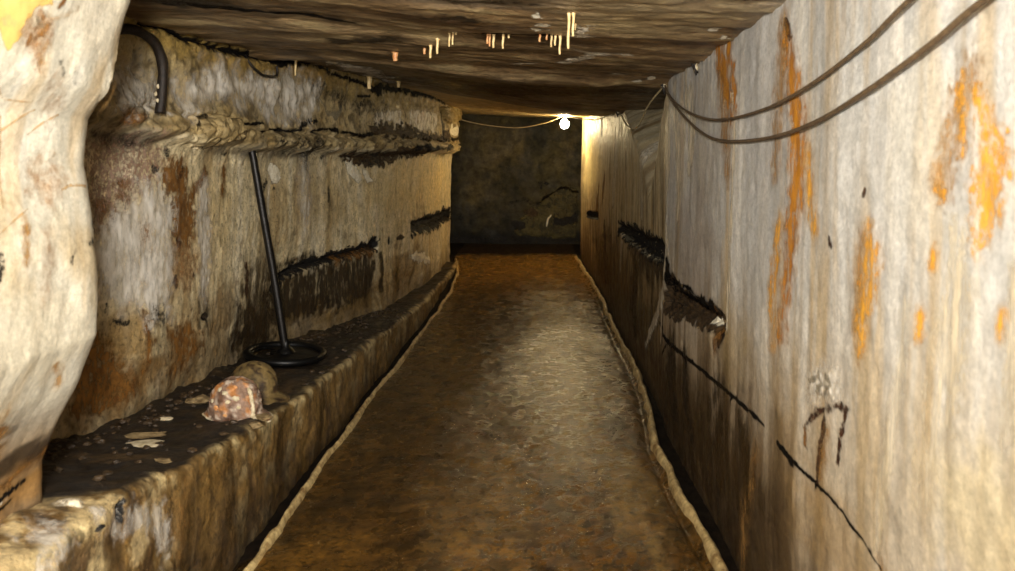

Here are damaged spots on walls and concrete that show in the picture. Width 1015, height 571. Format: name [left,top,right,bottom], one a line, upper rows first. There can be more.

spalling [269,205,451,293]
spalling [617,218,727,352]
rust [716,41,737,149]
rust [768,17,816,348]
rust [854,223,878,358]
rust [933,59,1012,255]
crack [659,322,883,571]